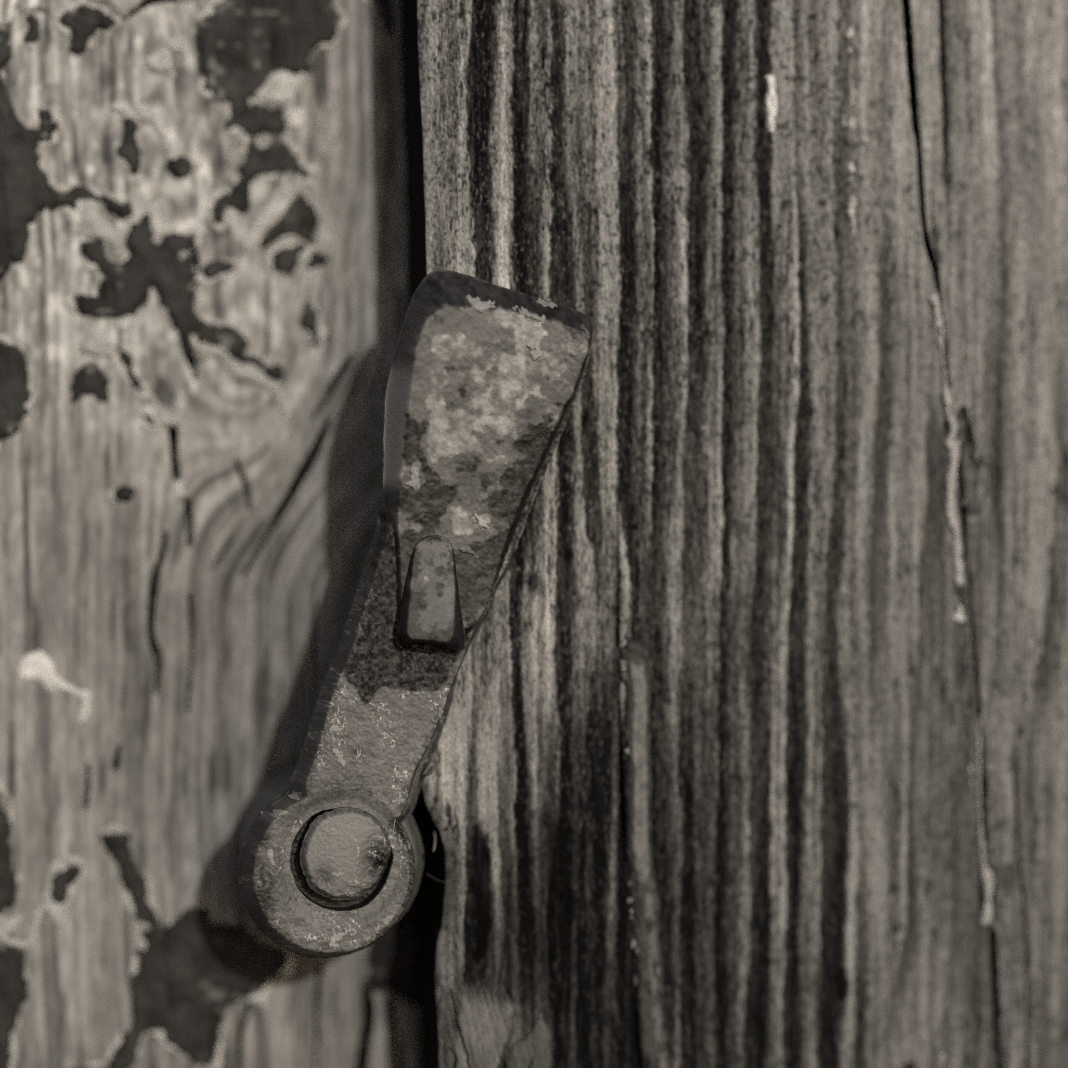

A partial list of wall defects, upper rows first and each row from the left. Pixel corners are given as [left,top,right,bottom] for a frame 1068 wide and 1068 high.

peeling [365,0,397,39]
peeling [0,0,349,431]
peeling [0,333,36,449]
peeling [18,650,91,723]
peeling [105,483,137,505]
corrosion [346,512,469,703]
peeling [405,467,421,490]
crack [901,0,1030,1068]
peeling [0,781,88,1068]
peeling [84,823,296,1068]
peeling [329,932,345,950]
peeling [363,798,426,1008]